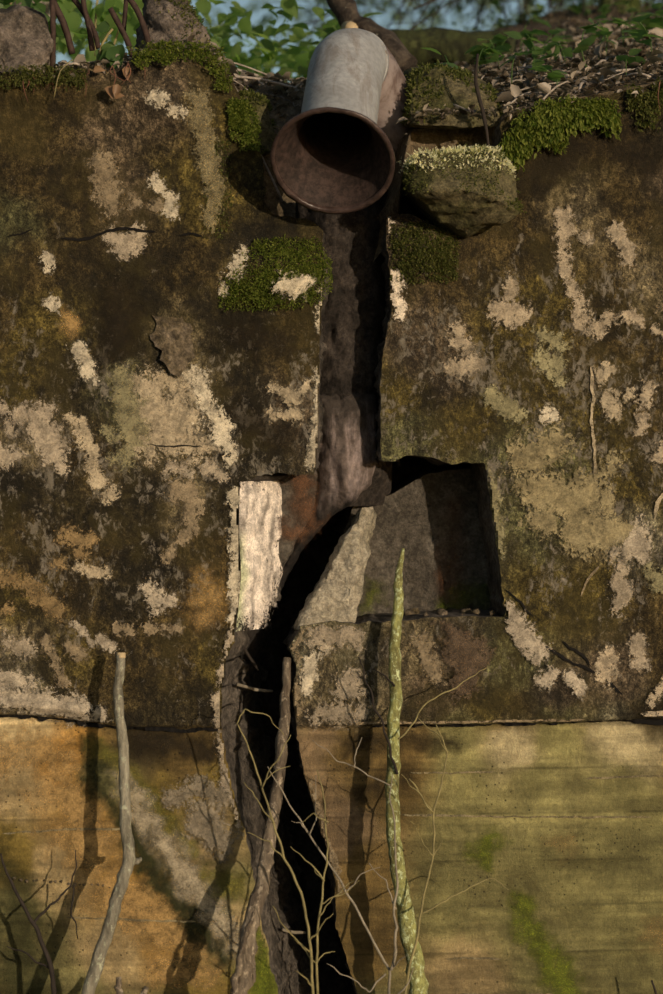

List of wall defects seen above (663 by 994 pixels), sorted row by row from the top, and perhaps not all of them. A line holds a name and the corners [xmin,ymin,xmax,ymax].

crack [314,233,330,473]
crack [374,216,401,465]
water stain [80,735,245,966]
water stain [128,728,220,766]
crack [0,601,357,994]